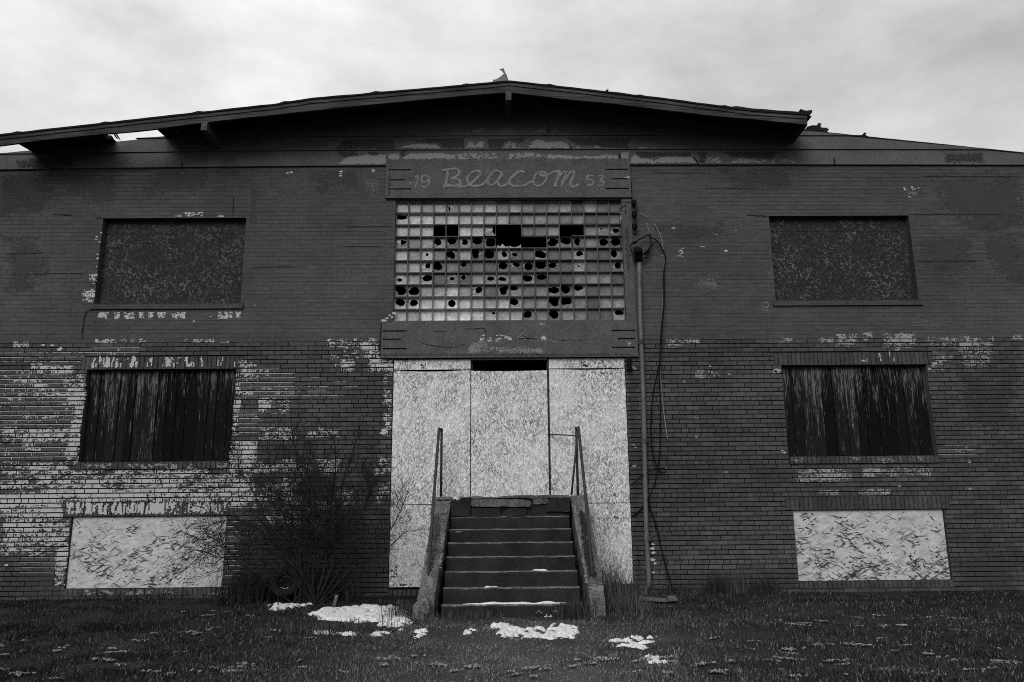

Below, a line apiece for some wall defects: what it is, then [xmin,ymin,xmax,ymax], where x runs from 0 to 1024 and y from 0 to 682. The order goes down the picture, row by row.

peeling [339,127,796,177]
peeling [98,312,195,322]
peeling [819,321,994,372]
peeling [326,338,393,435]
peeling [0,339,357,585]
peeling [795,466,933,495]